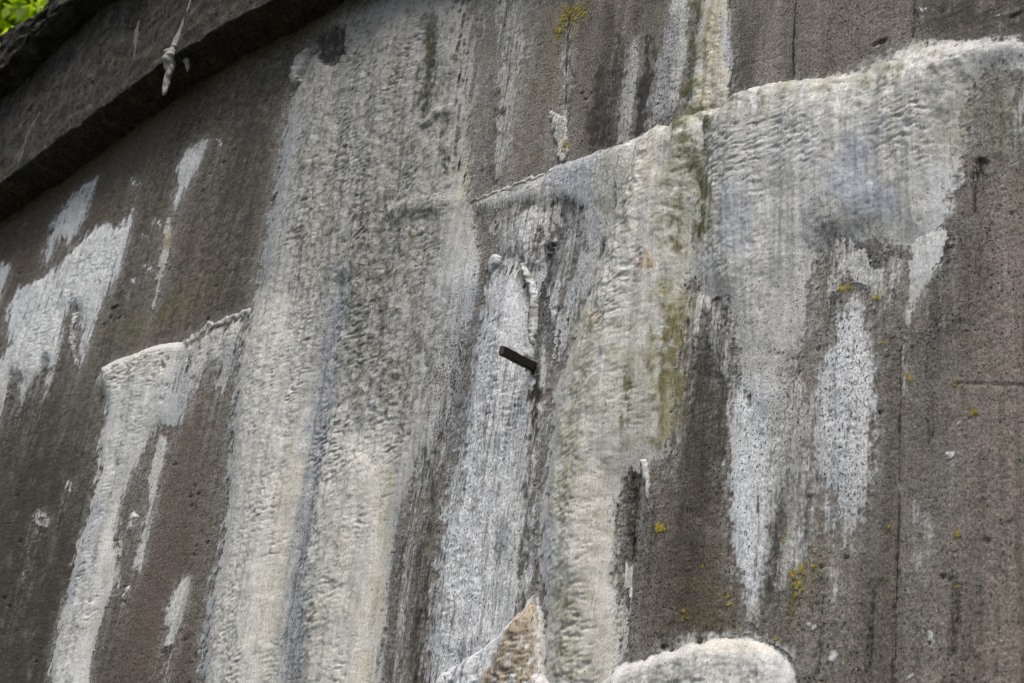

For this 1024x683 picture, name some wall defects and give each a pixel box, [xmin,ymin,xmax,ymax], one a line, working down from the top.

water stain [983,83,1024,175]
water stain [0,176,135,424]
water stain [152,138,211,310]
water stain [520,199,575,346]
water stain [526,375,542,464]
water stain [114,435,169,591]
water stain [517,477,530,586]
water stain [640,459,651,499]
water stain [767,442,842,602]
water stain [912,500,934,570]
water stain [162,575,191,683]
water stain [617,561,633,653]